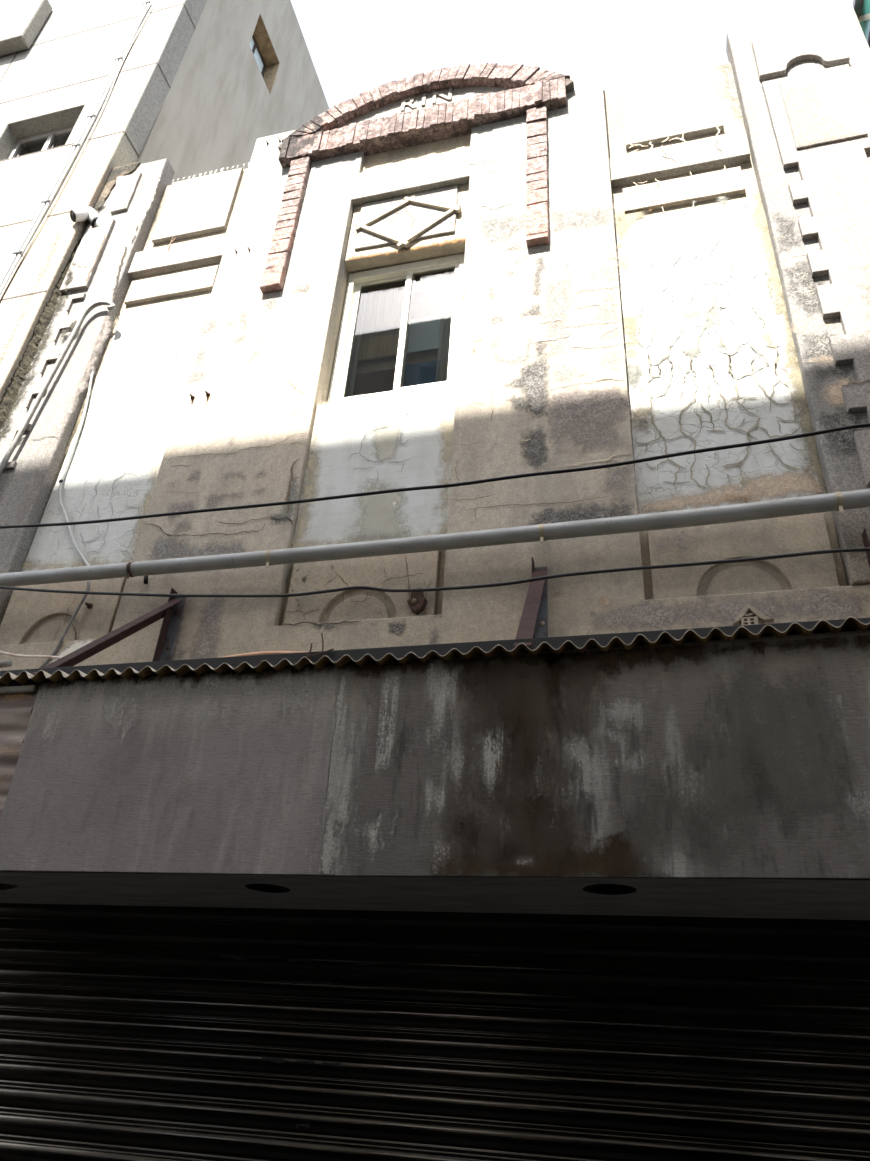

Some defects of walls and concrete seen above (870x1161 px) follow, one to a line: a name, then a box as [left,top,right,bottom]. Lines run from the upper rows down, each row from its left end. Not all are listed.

damp [0,239,81,439]
damp [23,316,109,513]
crack [31,226,304,565]
crack [349,402,436,482]
crack [452,389,607,520]
damp [615,210,643,269]
damp [622,313,642,387]
crack [534,126,870,491]
damp [749,191,828,494]
damp [172,599,223,659]
crack [283,557,432,626]
damp [34,635,870,876]